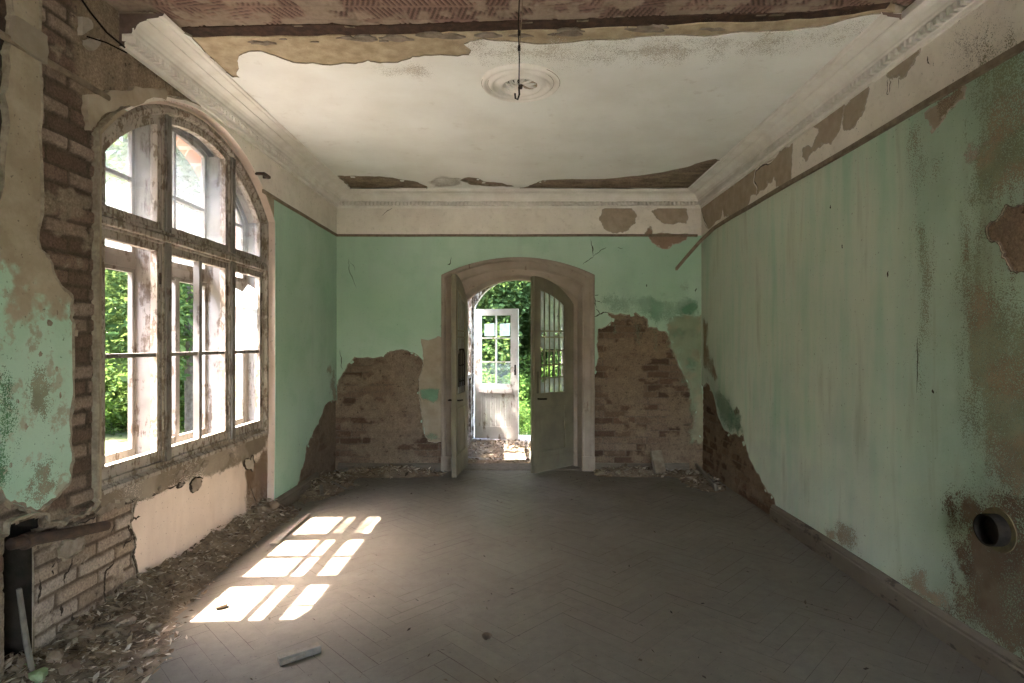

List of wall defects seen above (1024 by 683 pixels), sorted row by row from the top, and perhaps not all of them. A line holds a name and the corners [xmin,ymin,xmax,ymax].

spalling [193,2,895,76]
peeling [886,48,929,95]
spalling [338,176,427,189]
spalling [460,159,720,189]
peeling [599,208,689,249]
peeling [701,86,870,229]
spalling [0,0,268,680]
leakage [897,11,1024,658]
leakage [0,370,21,488]
spalling [297,336,441,485]
spalling [595,312,776,515]
crack [78,485,177,601]